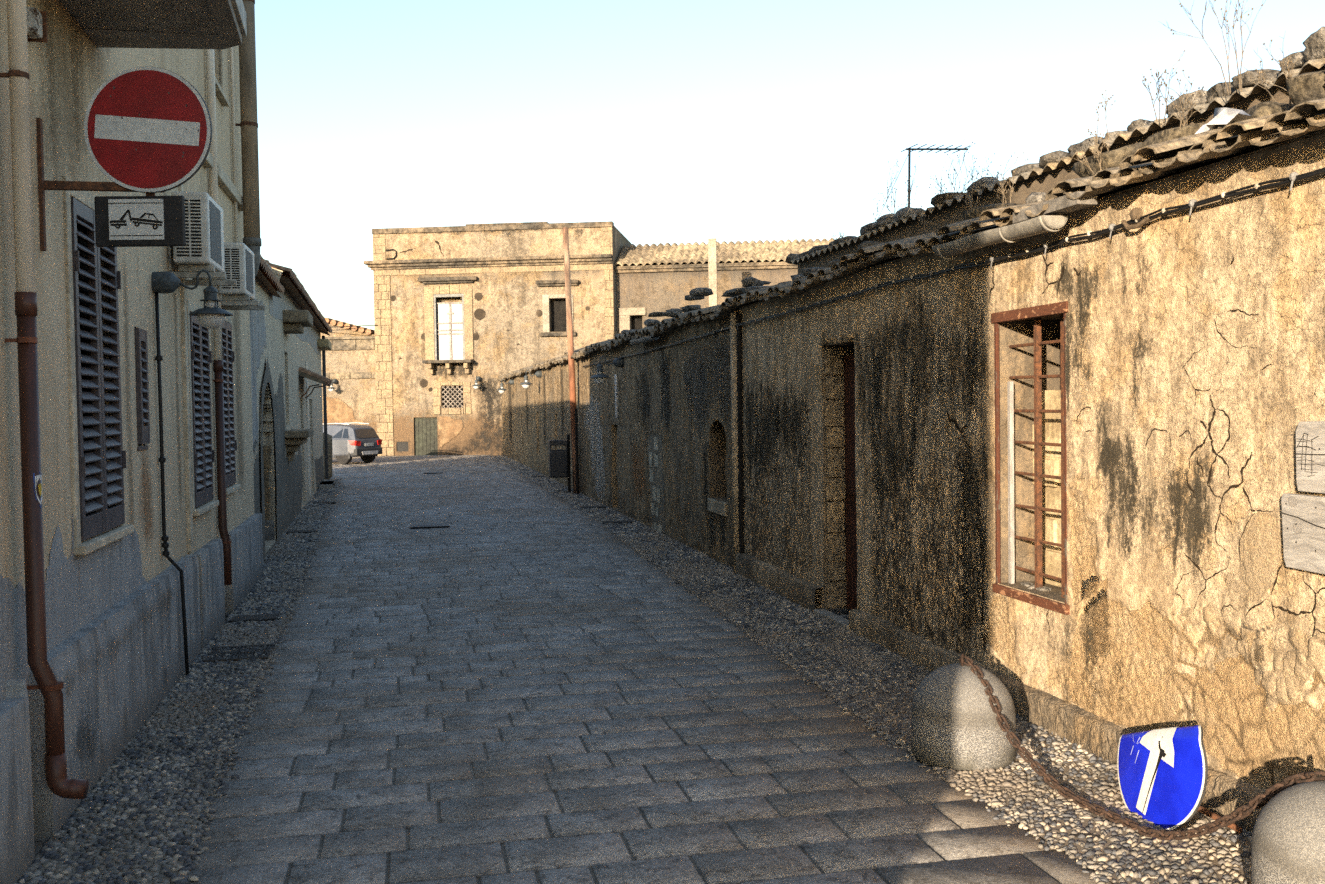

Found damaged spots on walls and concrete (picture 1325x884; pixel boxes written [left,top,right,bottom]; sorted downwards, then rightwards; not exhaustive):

leakage [636,336,805,549]
leakage [855,285,989,509]
leakage [957,440,991,625]
leakage [1093,401,1214,569]
crack [1145,309,1325,637]